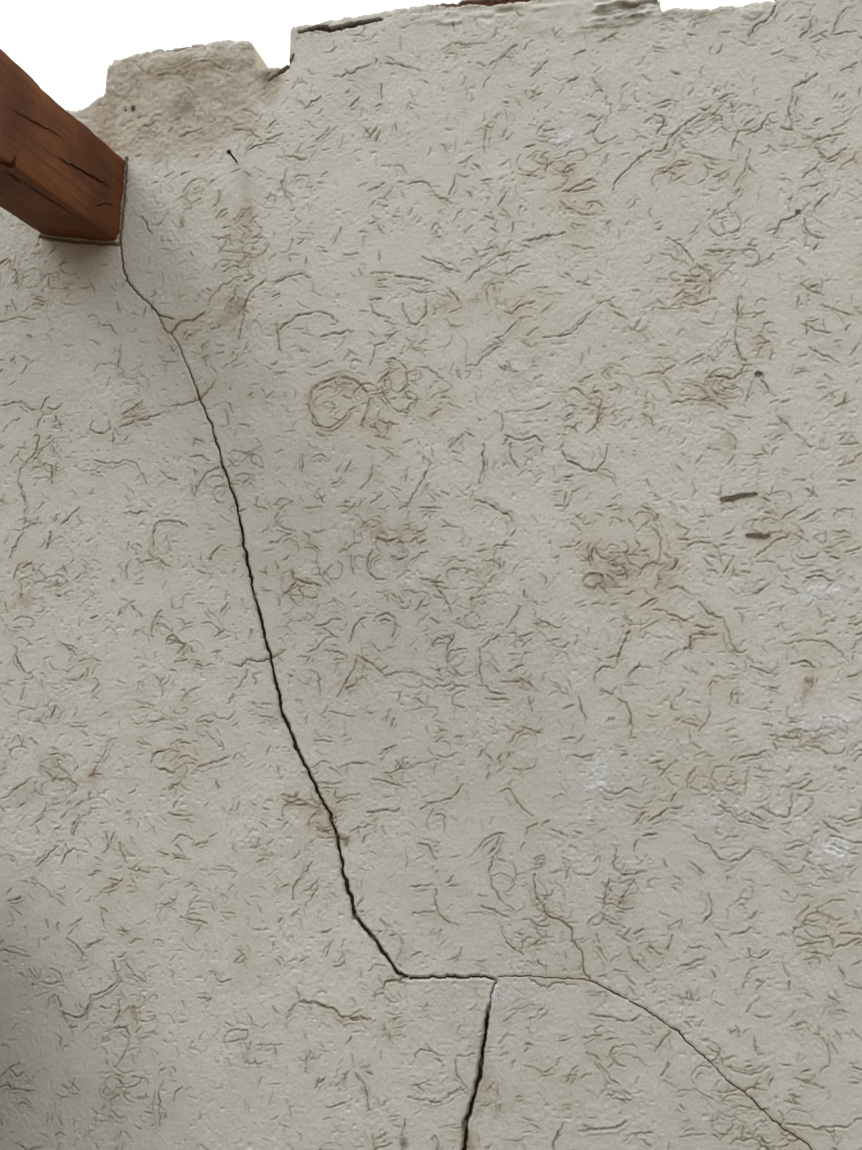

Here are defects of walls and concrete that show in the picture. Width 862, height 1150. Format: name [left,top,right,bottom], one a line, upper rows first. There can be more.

crack [120,243,813,1150]